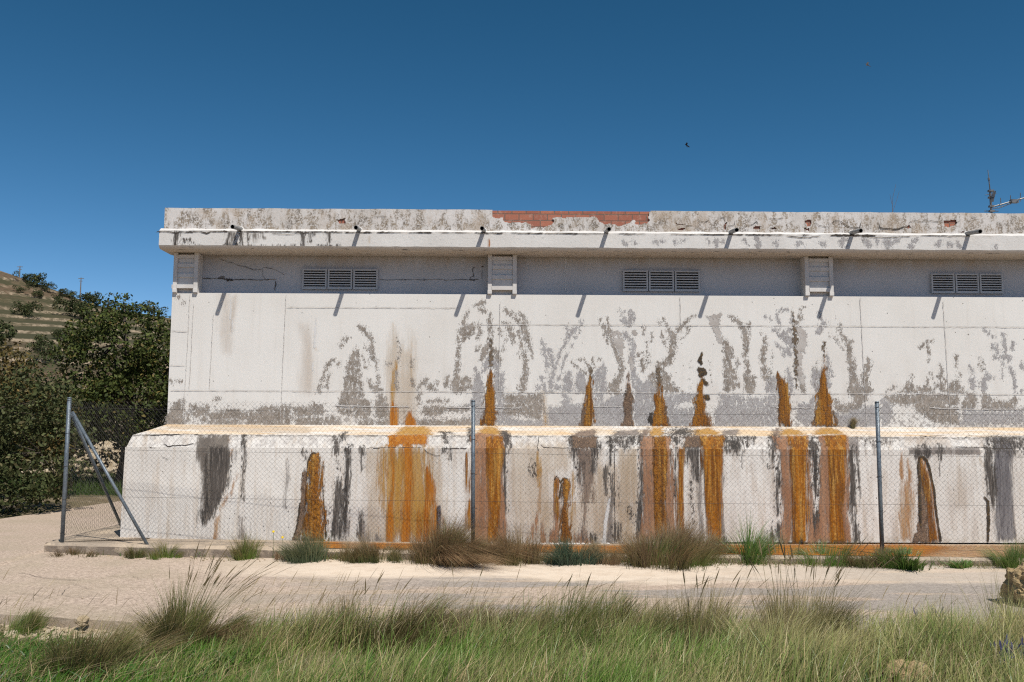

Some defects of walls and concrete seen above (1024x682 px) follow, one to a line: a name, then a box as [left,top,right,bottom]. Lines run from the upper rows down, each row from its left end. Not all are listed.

crack [202,260,284,289]
flaking render [492,211,650,228]
water stain [196,434,247,526]
water stain [327,431,379,541]
rust [292,337,448,550]
rust [465,337,513,542]
water stain [566,372,641,544]
rust [527,366,685,553]
rust [689,352,750,554]
rust [760,341,1024,557]
water stain [860,435,1024,542]